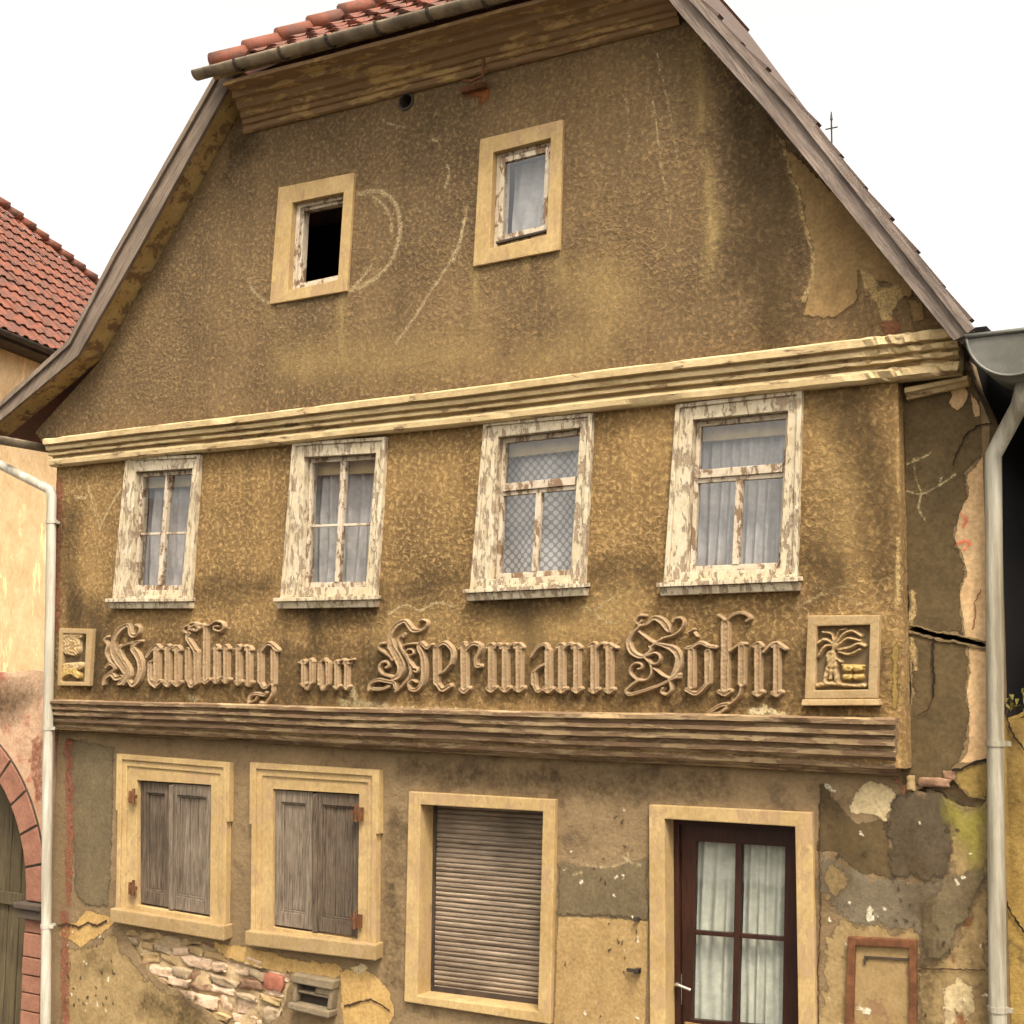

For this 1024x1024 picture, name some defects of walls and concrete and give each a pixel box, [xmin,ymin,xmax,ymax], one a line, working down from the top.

flaking render [776,134,924,336]
crack [903,421,992,520]
flaking render [817,370,987,907]
crack [907,585,986,716]
damp [948,803,987,861]
flaking render [123,930,395,1024]
flaking render [819,889,989,1024]